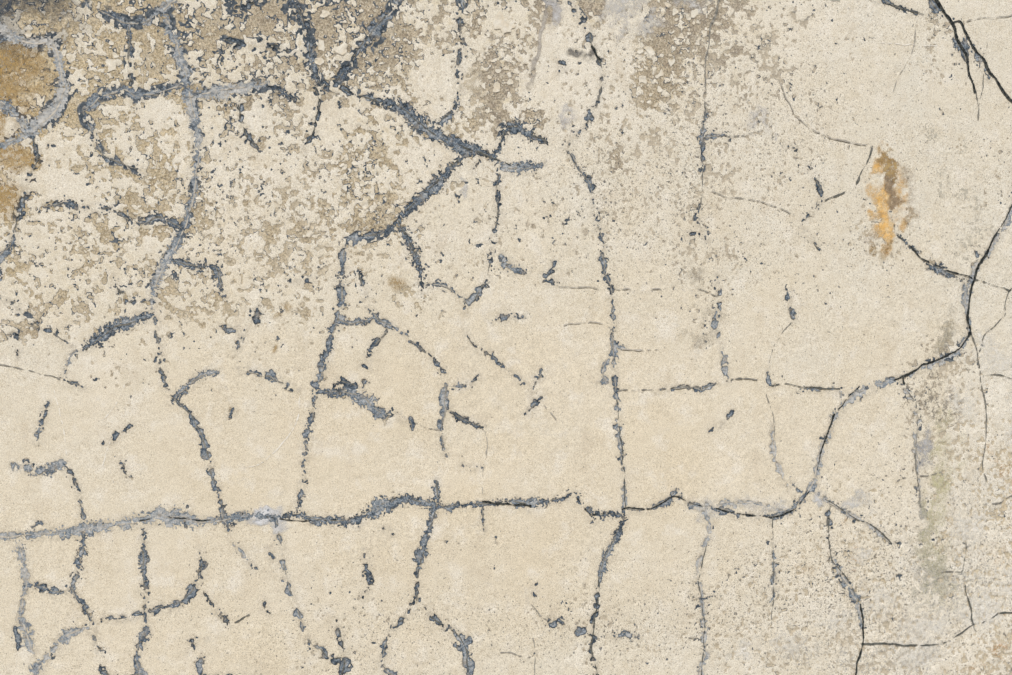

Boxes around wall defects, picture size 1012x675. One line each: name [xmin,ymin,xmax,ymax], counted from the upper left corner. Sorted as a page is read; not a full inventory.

crack [0,22,71,281]
crack [29,0,297,462]
crack [225,0,548,474]
crack [566,1,604,204]
crack [689,0,873,251]
rust [867,153,906,255]
peeling [831,194,948,277]
peeling [906,9,979,86]
crack [873,0,1012,120]
peeling [956,138,1012,213]
crack [0,205,1012,675]